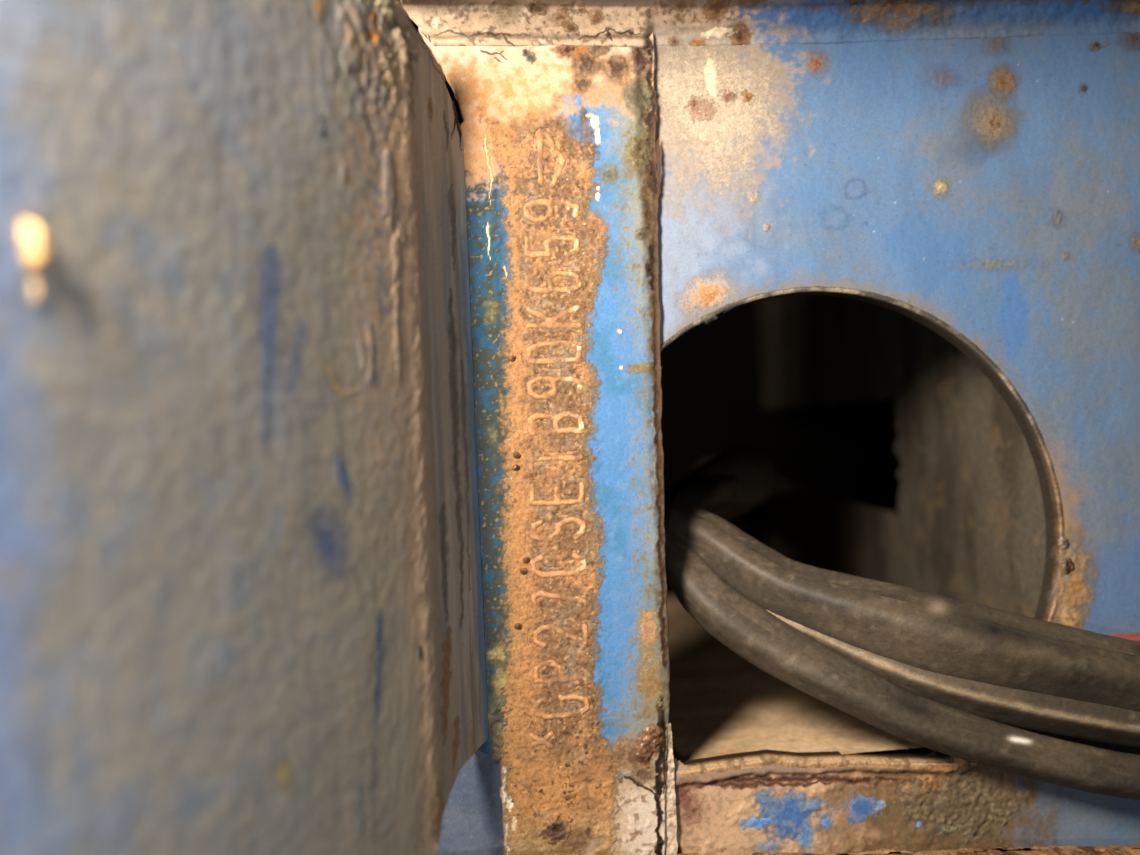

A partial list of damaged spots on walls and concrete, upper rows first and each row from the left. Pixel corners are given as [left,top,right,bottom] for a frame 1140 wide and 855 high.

corrosion [399,0,464,11]
corrosion [528,3,653,93]
corrosion [849,0,955,33]
corrosion [684,89,754,123]
peeling [654,23,785,194]
corrosion [676,272,737,315]
corrosion [485,110,664,855]
corrosion [1051,530,1096,628]
spalling [922,757,967,773]
corrosion [675,776,701,826]
peeling [738,788,886,852]
corrosion [752,761,1140,855]